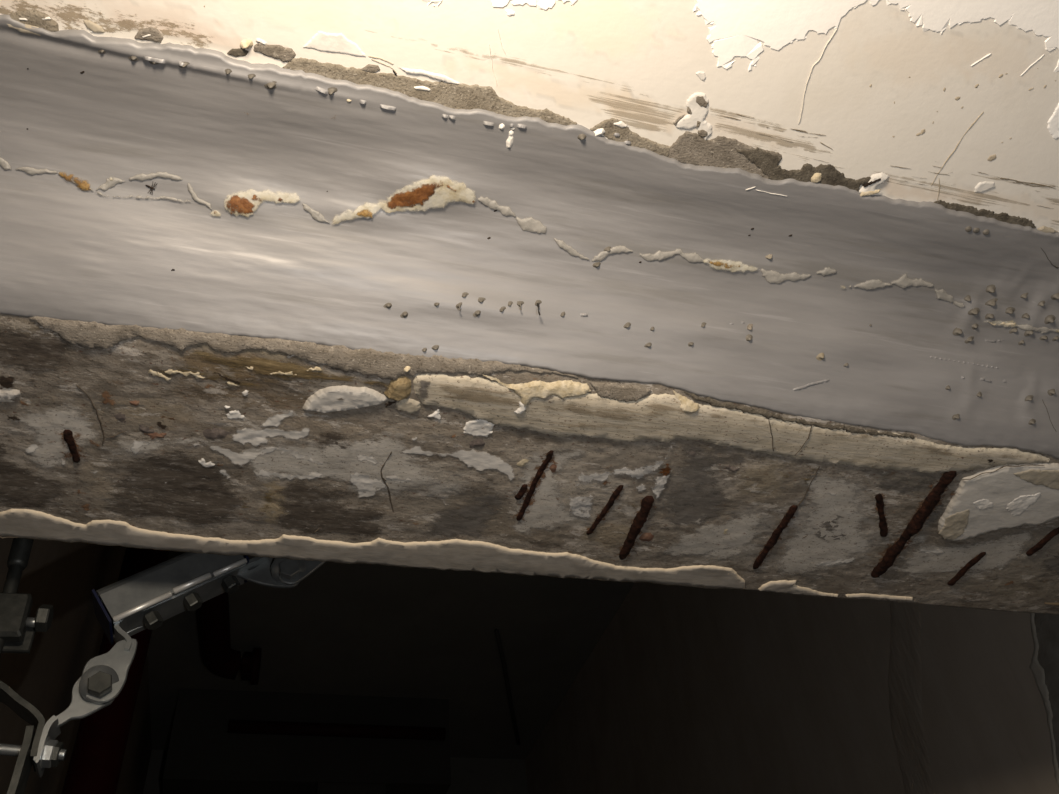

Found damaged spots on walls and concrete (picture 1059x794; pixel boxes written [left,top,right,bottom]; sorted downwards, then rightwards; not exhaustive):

peeling [693,0,1059,72]
spalling [282,31,577,125]
spalling [663,71,889,197]
rust [59,172,90,190]
rust [211,189,300,217]
rust [333,175,475,224]
spalling [29,316,651,414]
leakage [0,443,66,508]
leakage [102,451,246,525]
peeling [194,405,323,489]
leakage [262,481,384,540]
peeling [402,419,557,521]